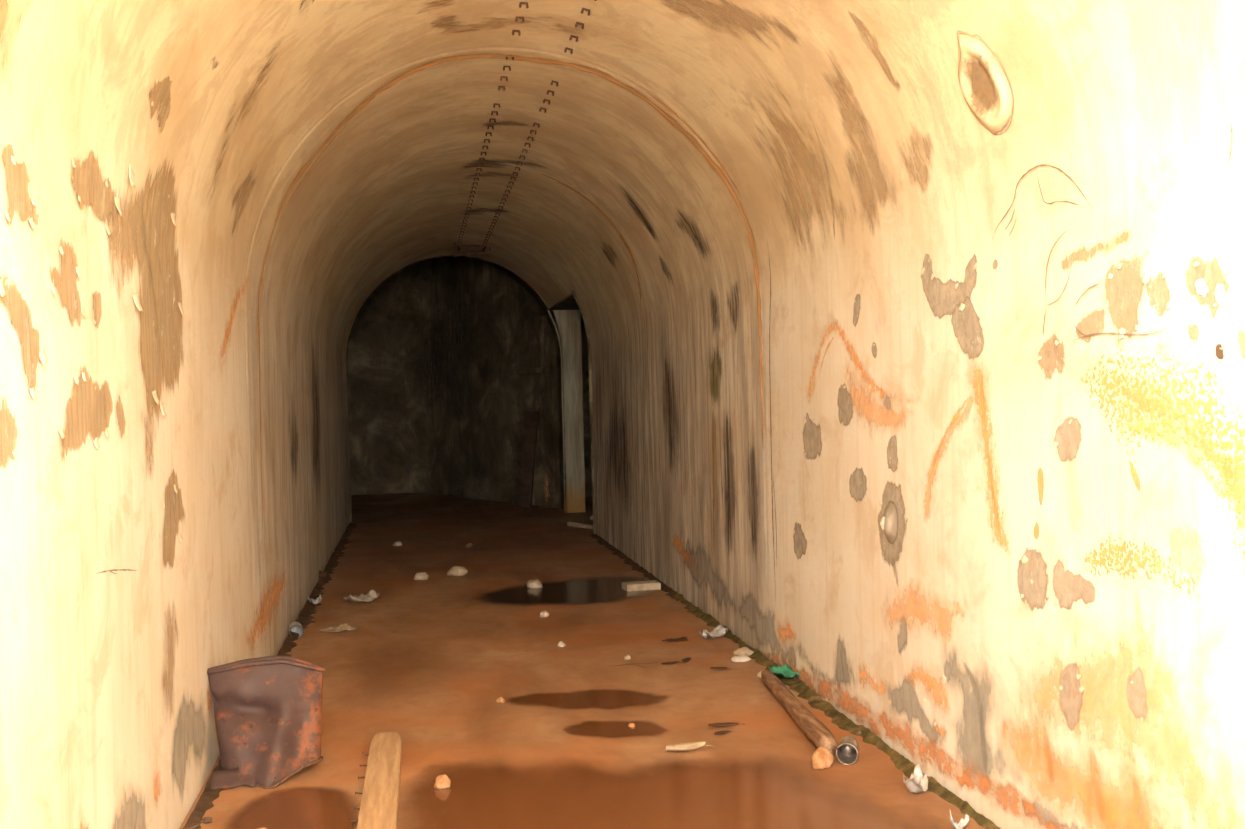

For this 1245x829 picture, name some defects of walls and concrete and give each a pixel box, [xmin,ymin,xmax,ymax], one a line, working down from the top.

peeling [2,145,38,228]
peeling [51,237,102,327]
peeling [58,366,126,458]
peeling [72,150,184,419]
rust [809,323,904,427]
rust [925,370,1006,547]
crack [995,164,1166,341]
peeling [1038,258,1172,379]
rust [1085,345,1245,558]
peeling [1186,257,1228,318]
rust [1084,537,1194,593]
rust [768,654,1158,829]